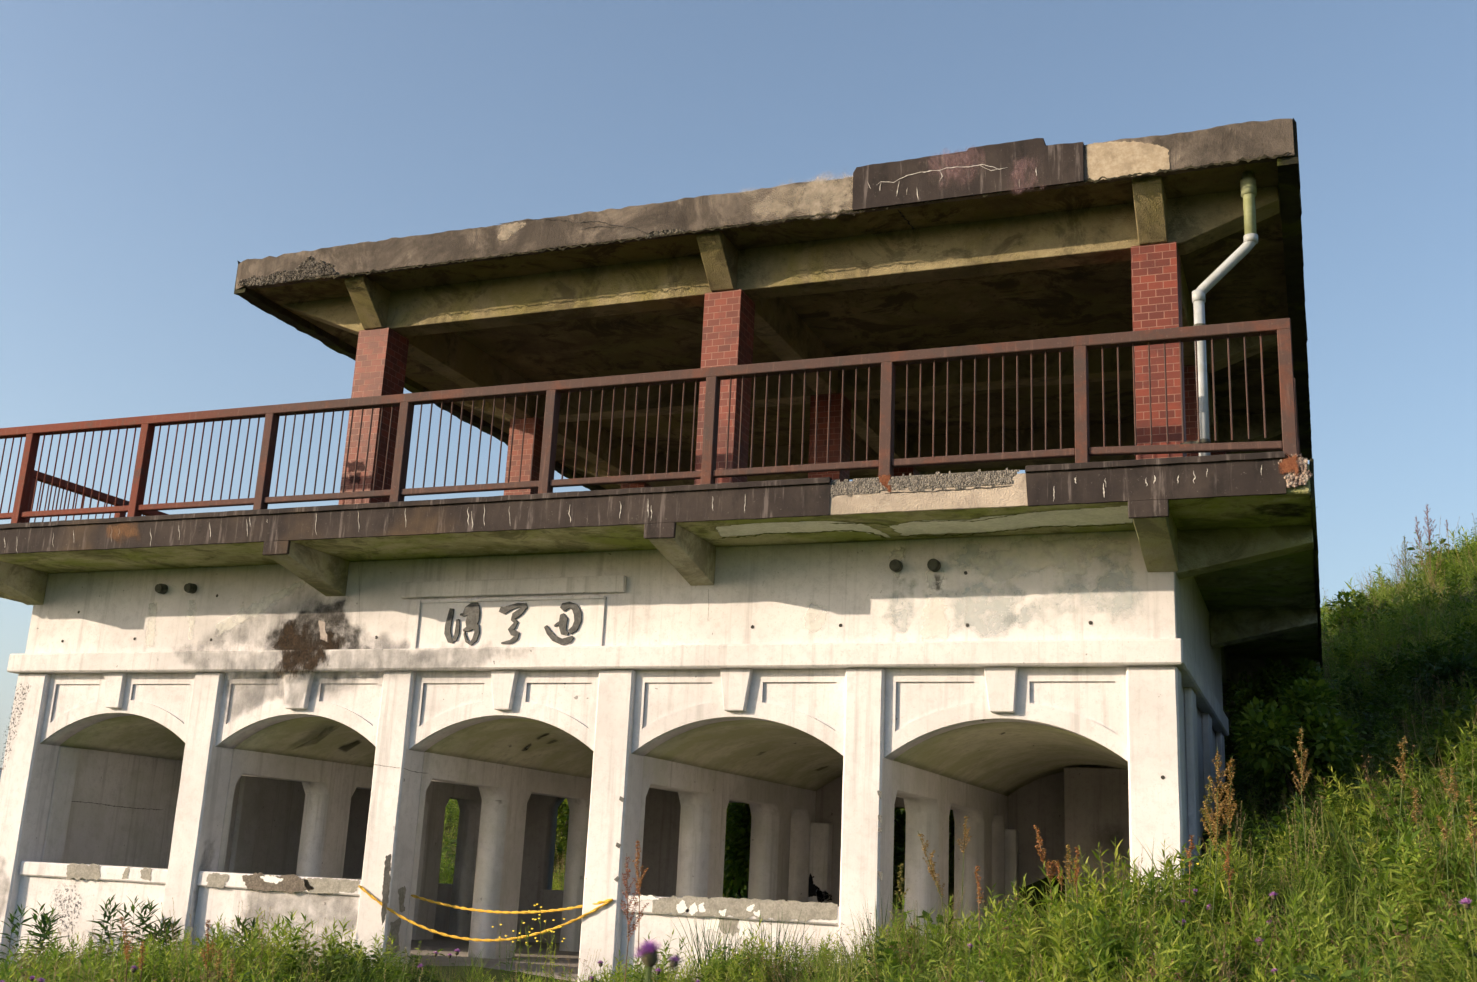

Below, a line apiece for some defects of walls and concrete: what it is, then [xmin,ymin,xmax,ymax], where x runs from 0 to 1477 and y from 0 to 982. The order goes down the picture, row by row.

spalling [238,256,336,286]
spalling [830,468,1020,498]
spalling [1278,453,1313,488]
water stain [230,601,369,707]
flaking render [206,872,359,894]